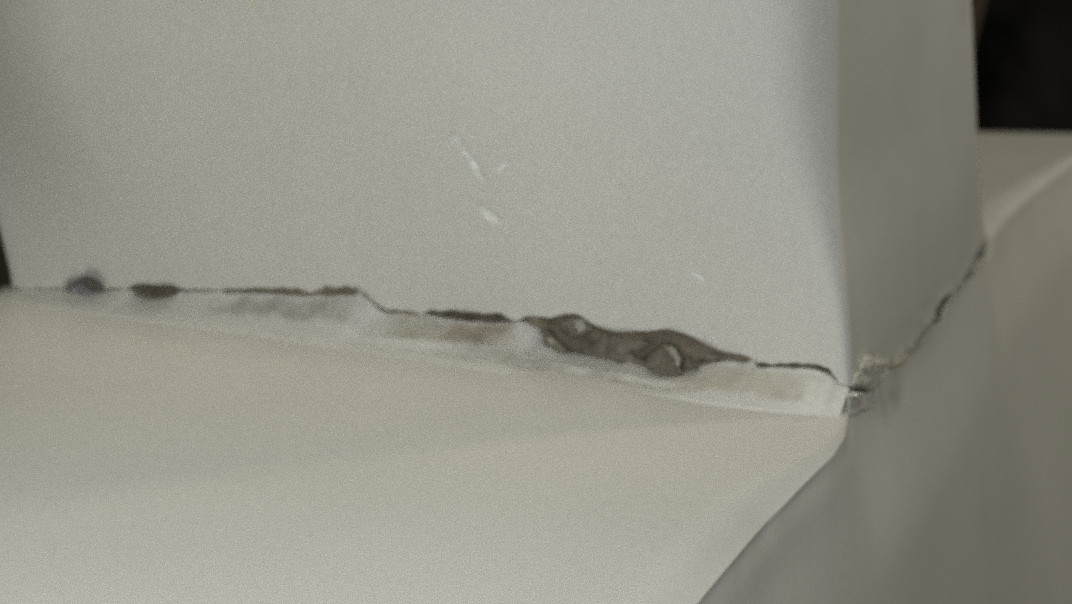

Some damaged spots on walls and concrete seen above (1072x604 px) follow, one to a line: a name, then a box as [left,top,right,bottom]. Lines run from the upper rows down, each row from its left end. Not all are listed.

crack [190,286,529,323]
spalling [529,314,758,377]
crack [759,322,932,393]